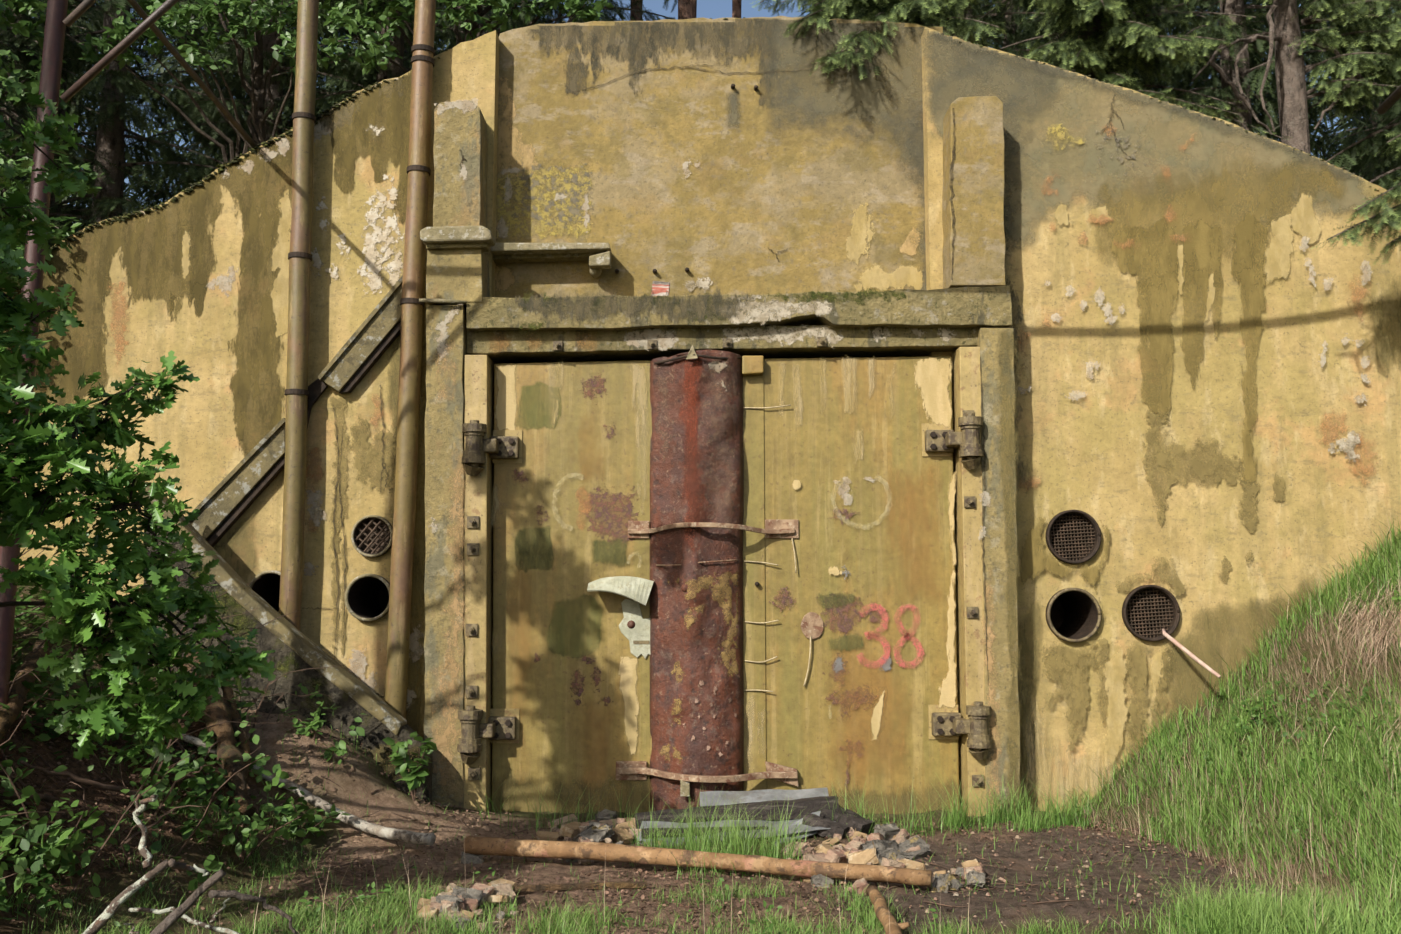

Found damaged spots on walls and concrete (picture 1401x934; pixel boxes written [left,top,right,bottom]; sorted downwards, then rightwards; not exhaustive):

damp [566,22,662,95]
damp [34,133,293,456]
peeling [271,190,292,337]
peeling [311,174,405,295]
corrosion [577,486,640,543]
corrosion [680,357,702,547]
spalling [641,202,925,413]
peeling [908,328,957,427]
damp [999,333,1110,811]
damp [1099,164,1342,533]
peeling [618,657,639,755]
damp [1124,582,1311,756]